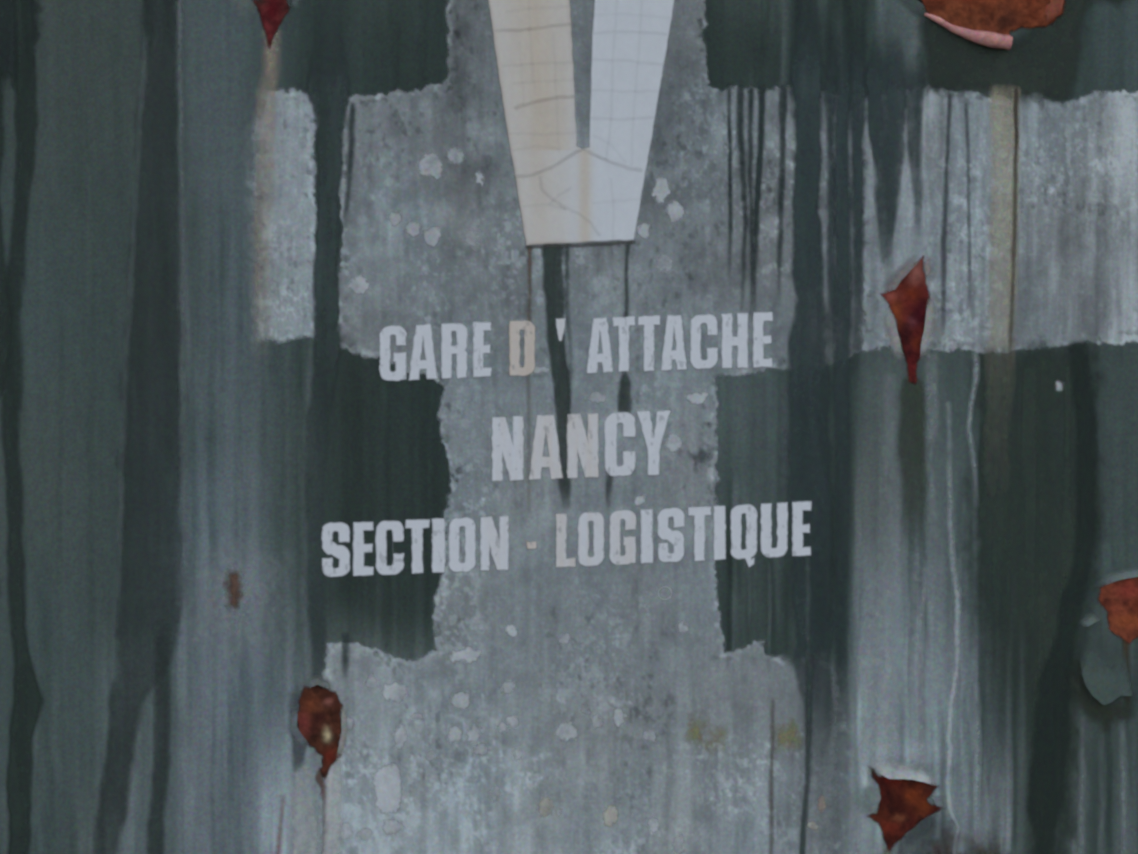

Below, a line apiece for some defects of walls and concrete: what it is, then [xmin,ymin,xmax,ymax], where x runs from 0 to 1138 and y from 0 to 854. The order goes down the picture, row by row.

peeling [254,88,317,343]
peeling [817,85,1138,384]
water stain [0,0,43,854]
peeling [290,0,845,854]
peeling [1081,641,1133,705]
peeling [1083,569,1138,643]